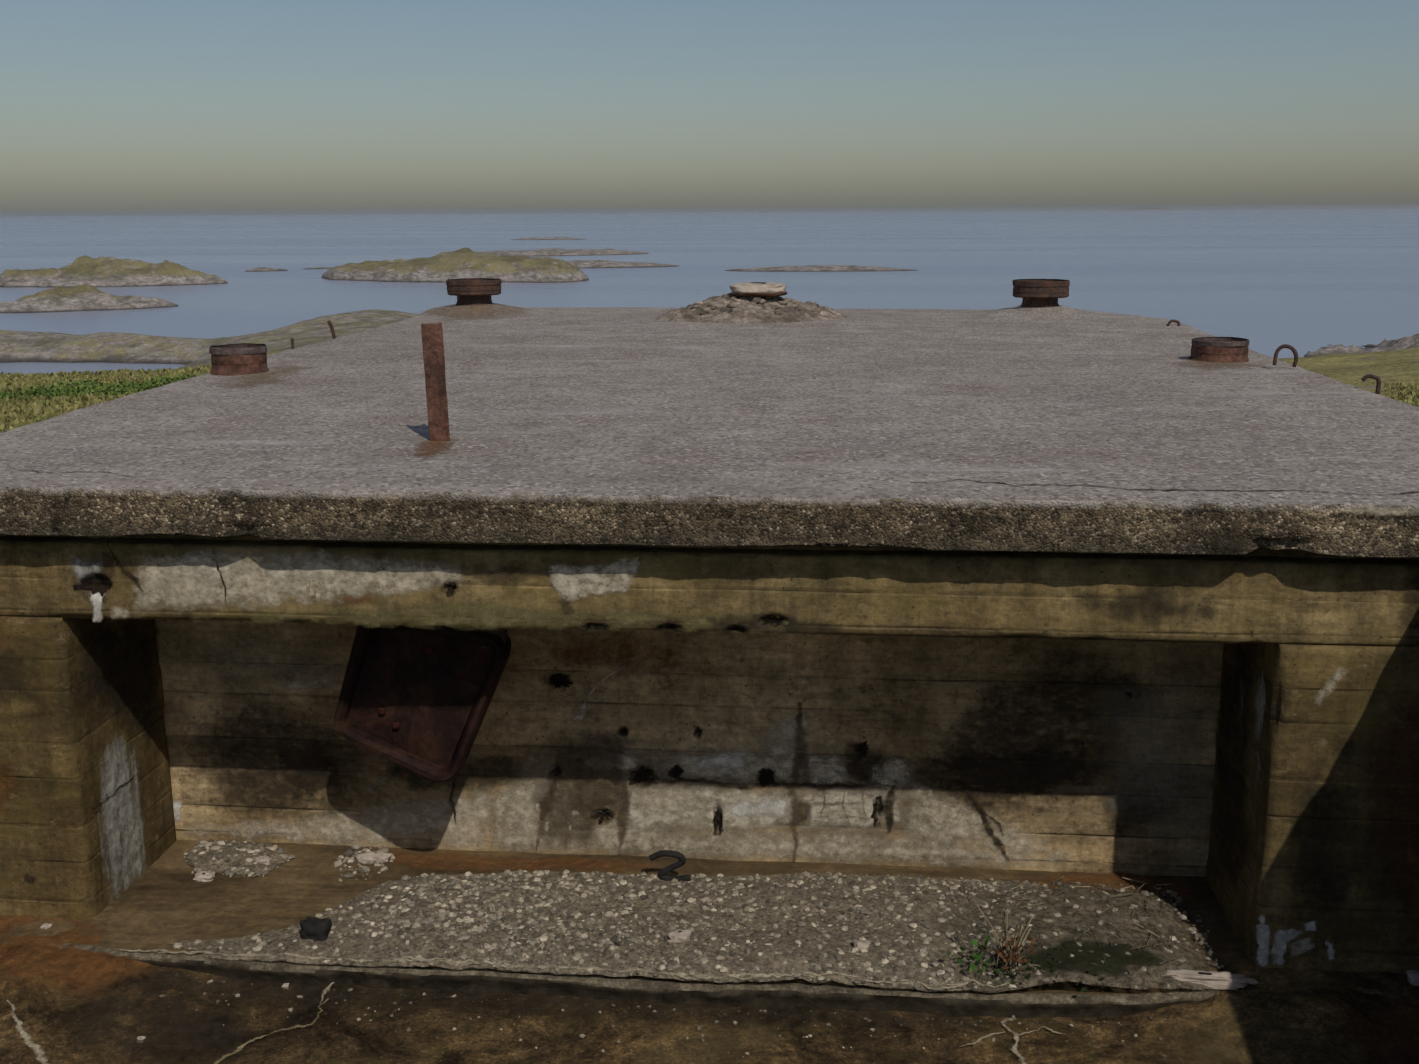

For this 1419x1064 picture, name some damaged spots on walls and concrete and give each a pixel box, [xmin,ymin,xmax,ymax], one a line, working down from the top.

water stain [74,559,99,578]
peeling [550,560,638,613]
water stain [81,551,460,894]
water stain [194,633,1135,863]
crack [958,780,1010,861]
water stain [1256,915,1334,966]
crack [6,1000,48,1064]
crack [214,998,329,1064]
crack [960,1015,1063,1064]